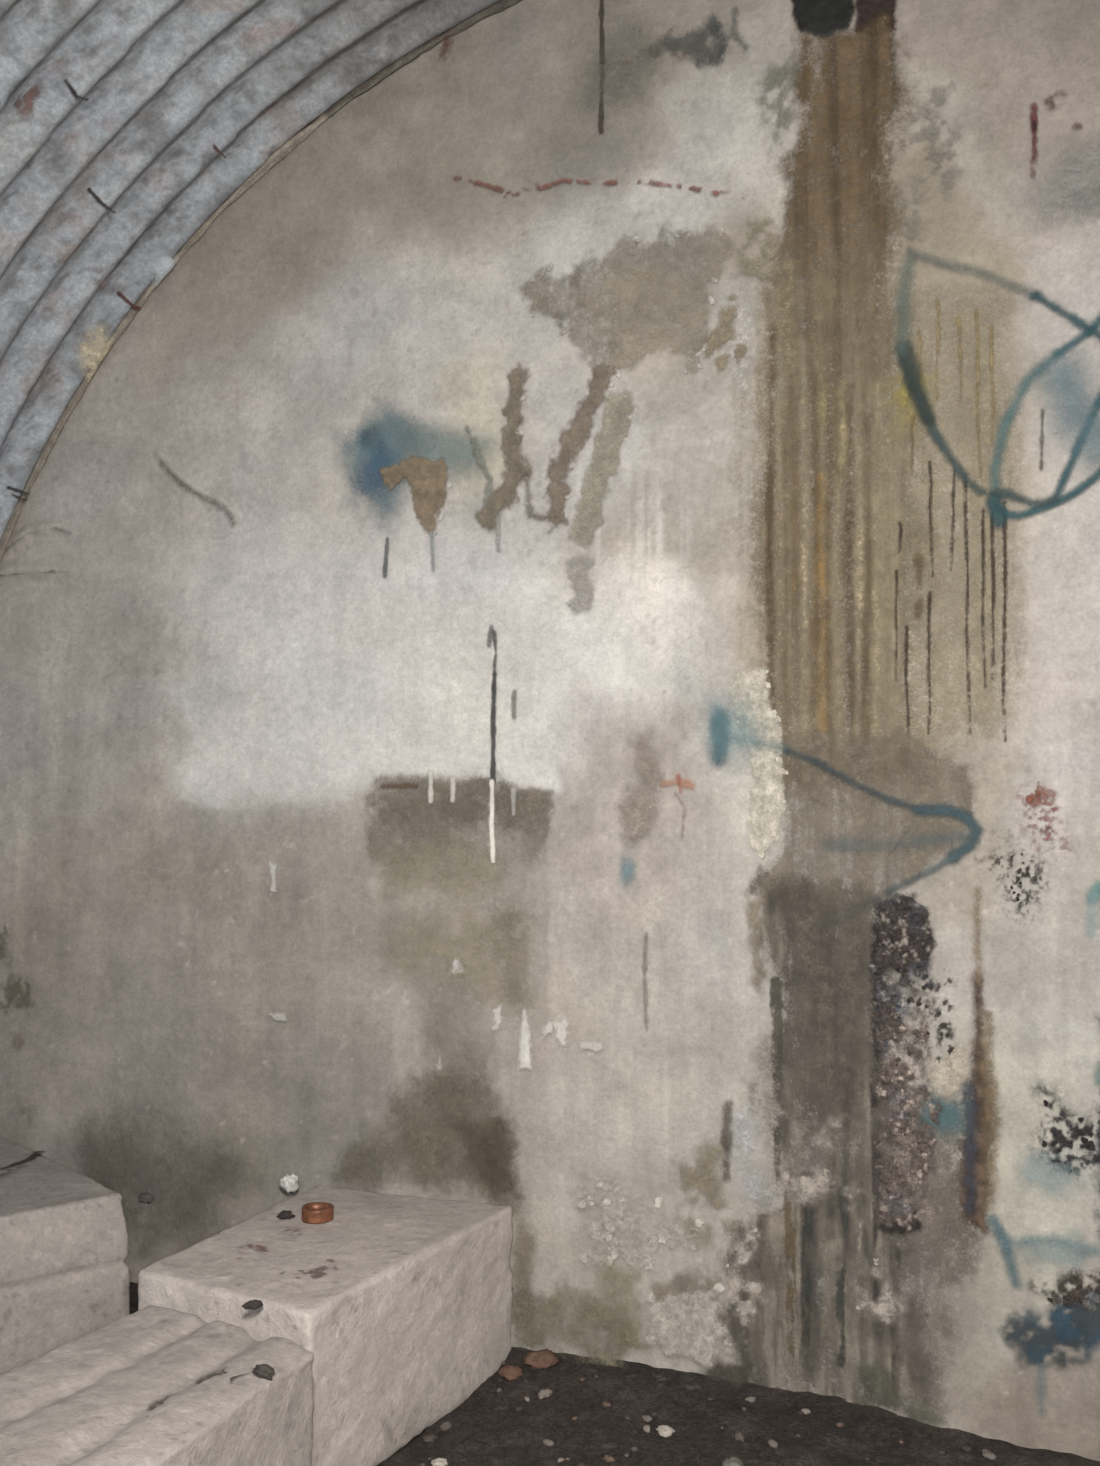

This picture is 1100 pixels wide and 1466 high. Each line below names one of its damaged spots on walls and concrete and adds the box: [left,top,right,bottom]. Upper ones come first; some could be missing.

rust [754,15,936,798]
damp [681,288,1015,1424]
damp [334,912,522,1205]
damp [512,1222,647,1366]
damp [653,1273,713,1302]